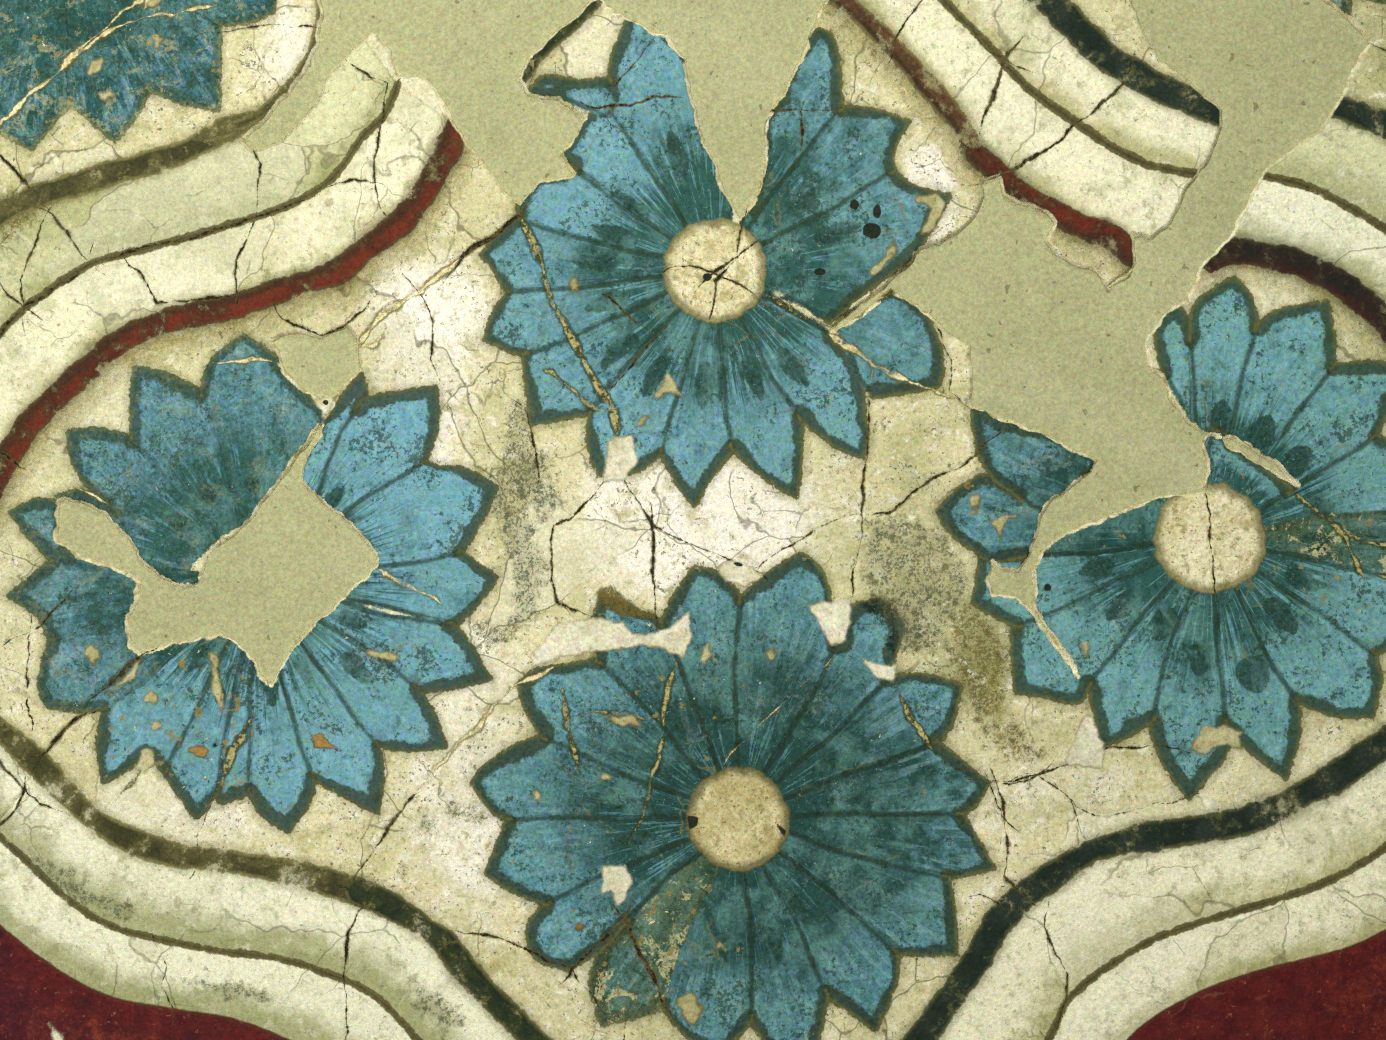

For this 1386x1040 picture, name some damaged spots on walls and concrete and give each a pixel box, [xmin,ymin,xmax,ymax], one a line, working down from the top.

peeling [209,653,224,708]
spalling [58,430,377,693]
spalling [274,328,360,405]
crack [0,0,677,437]
crack [509,397,540,484]
spalling [245,0,825,217]
peeling [654,374,681,398]
crack [550,210,1008,627]
leakage [861,517,1042,758]
spalling [836,0,1368,644]
crack [1205,481,1219,601]
crack [342,667,675,1040]